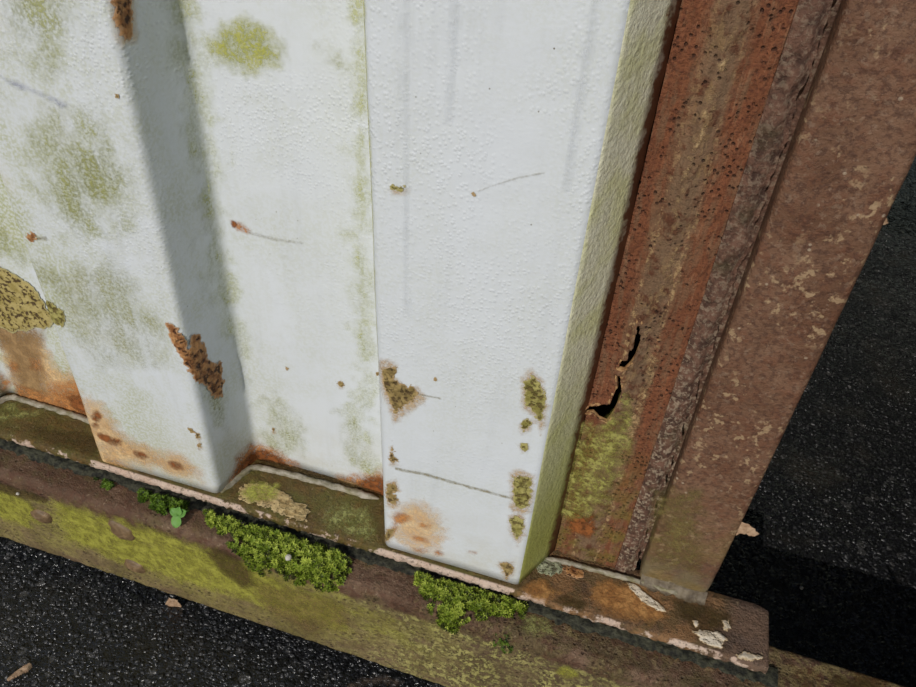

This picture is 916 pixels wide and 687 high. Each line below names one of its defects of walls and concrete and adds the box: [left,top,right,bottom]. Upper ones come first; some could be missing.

corrosion [110,0,133,41]
corrosion [0,267,192,475]
crack [585,318,657,435]